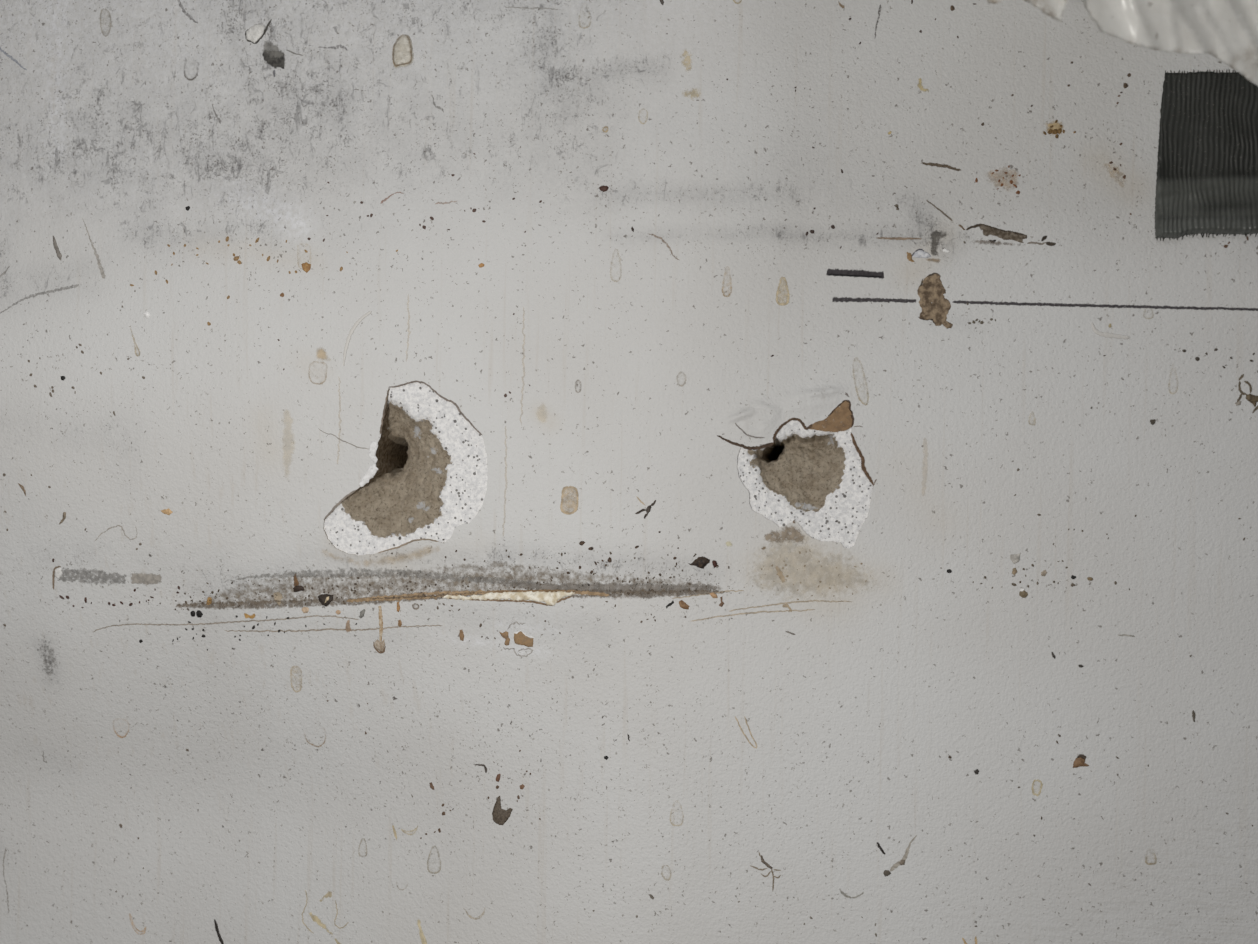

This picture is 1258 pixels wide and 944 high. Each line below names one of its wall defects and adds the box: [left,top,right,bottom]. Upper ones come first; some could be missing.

flaking render [318,381,488,555]
flaking render [717,392,877,549]